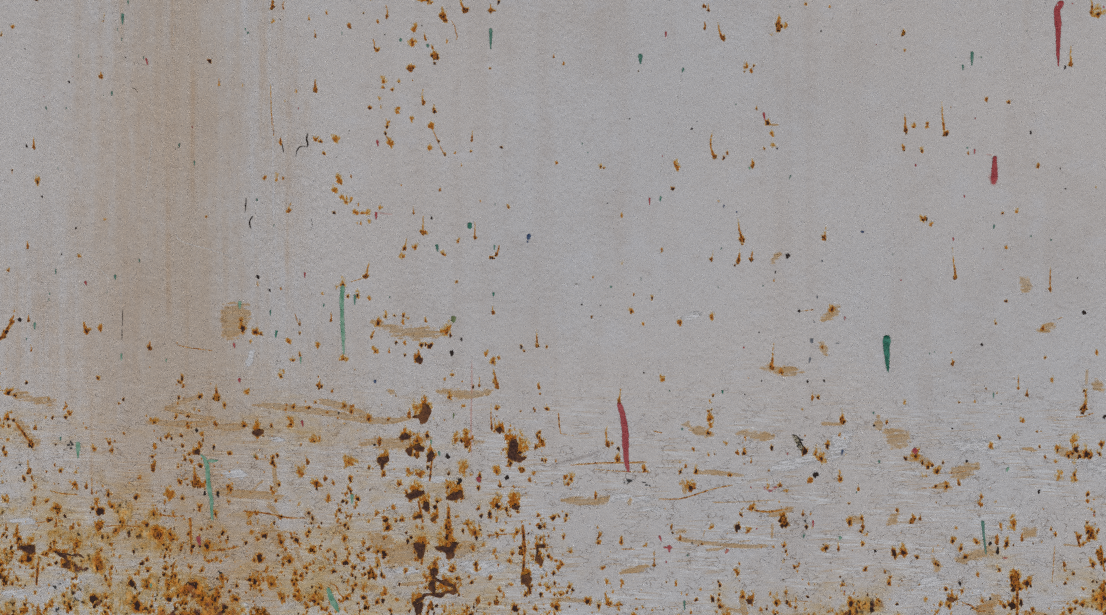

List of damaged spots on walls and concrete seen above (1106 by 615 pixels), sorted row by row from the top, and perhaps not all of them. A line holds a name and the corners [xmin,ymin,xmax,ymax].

rust [411,25,439,65]
rust [331,175,383,225]
rust [667,464,732,500]
rust [904,449,965,489]
rust [1036,430,1104,482]
rust [727,484,790,534]
rust [821,516,867,552]
rust [891,544,919,559]
rust [995,515,1042,549]
rust [632,580,728,615]